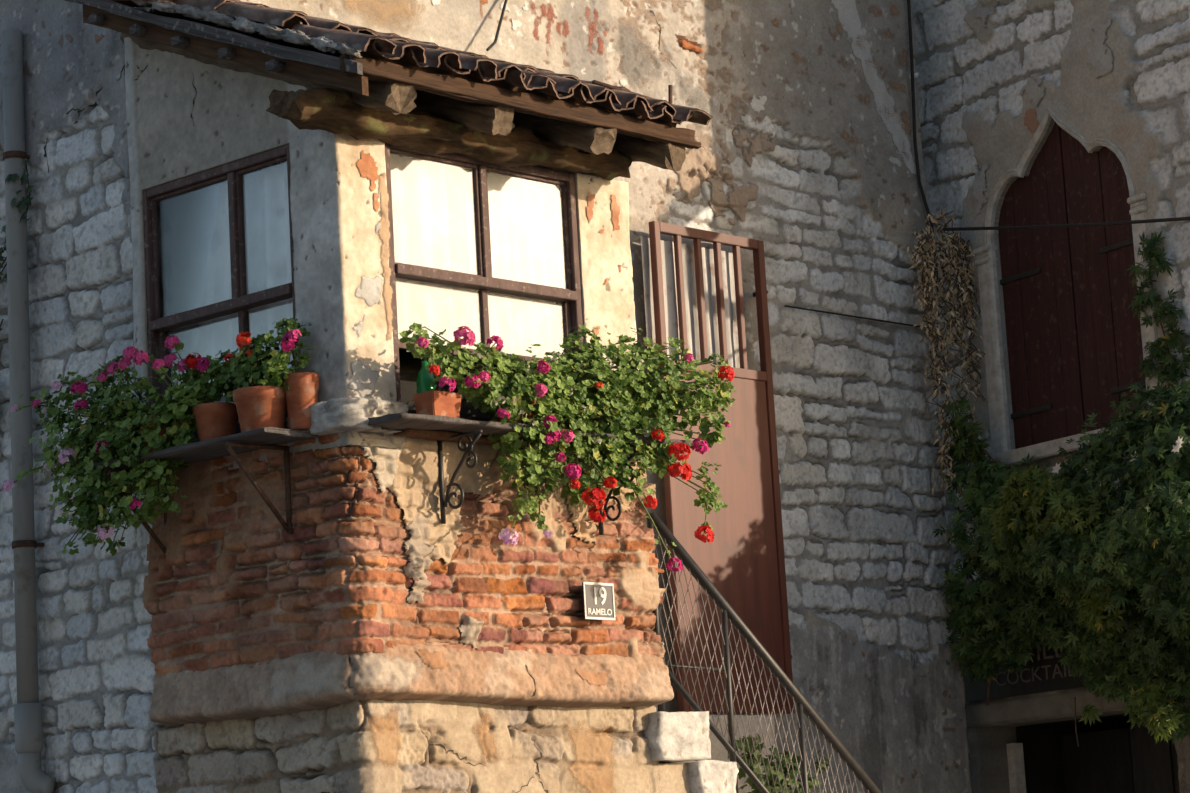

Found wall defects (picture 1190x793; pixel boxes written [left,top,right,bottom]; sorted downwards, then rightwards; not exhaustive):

peeling [682,0,722,19]
crack [66,65,148,124]
peeling [675,34,731,83]
peeling [668,95,776,225]
peeling [353,150,393,340]
peeling [350,431,499,603]
peeling [547,456,642,550]
peeling [459,615,484,649]
crack [512,665,548,793]